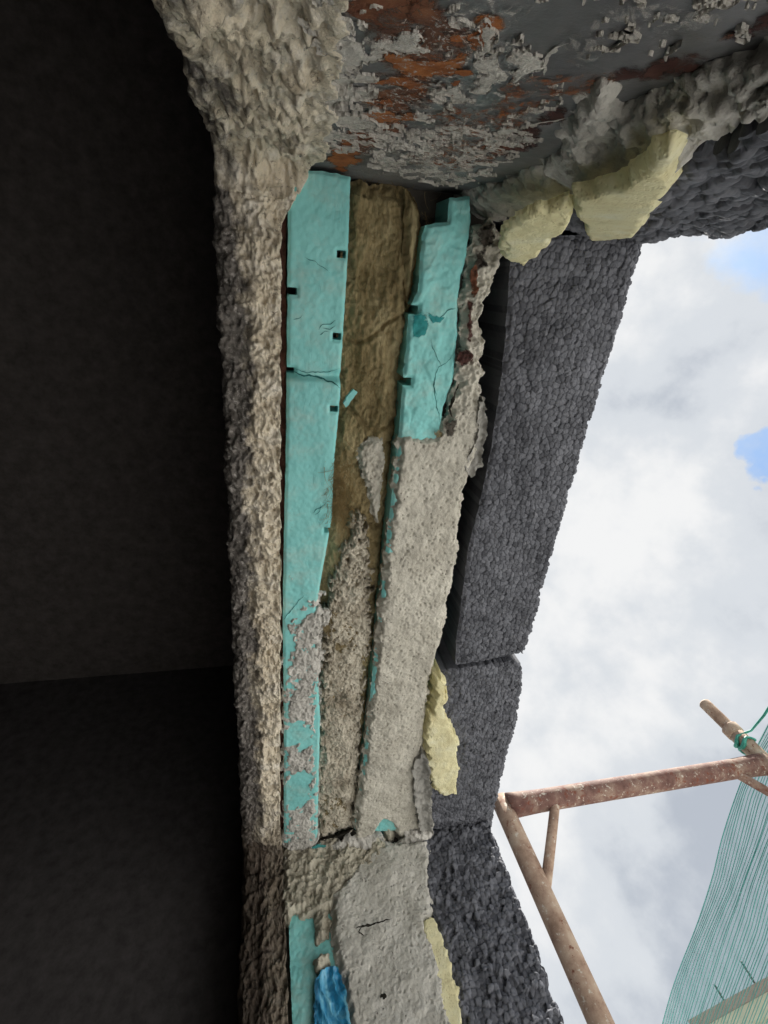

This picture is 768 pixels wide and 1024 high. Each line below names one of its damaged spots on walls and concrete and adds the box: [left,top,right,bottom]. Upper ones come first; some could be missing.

peeling [691,0,760,24]
peeling [589,29,642,54]
peeling [734,22,751,45]
corrosion [724,13,768,40]
corrosion [326,0,702,172]
peeling [306,15,558,187]
crack [312,828,356,849]
crack [356,919,390,936]